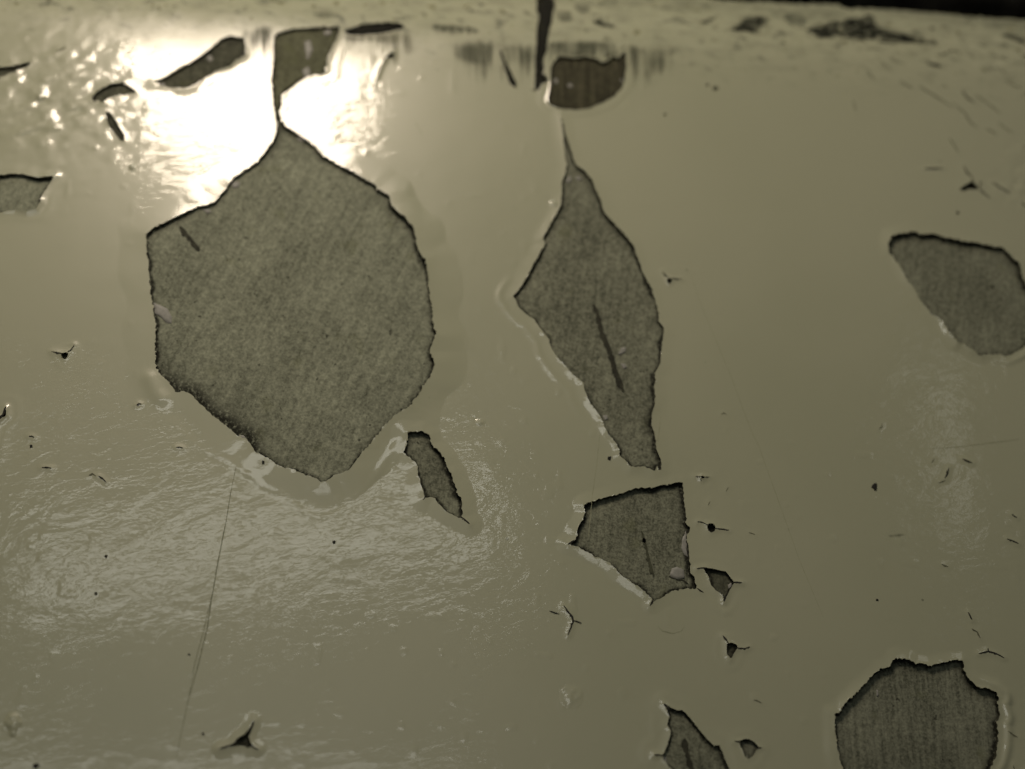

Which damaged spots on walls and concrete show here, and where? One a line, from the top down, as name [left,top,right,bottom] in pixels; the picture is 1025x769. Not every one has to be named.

peeling [0,174,53,212]
peeling [146,22,436,482]
peeling [513,0,664,471]
peeling [888,231,1025,356]
peeling [404,431,470,524]
peeling [568,482,742,606]
peeling [219,721,258,750]
peeling [655,703,729,769]
peeling [835,658,1000,769]